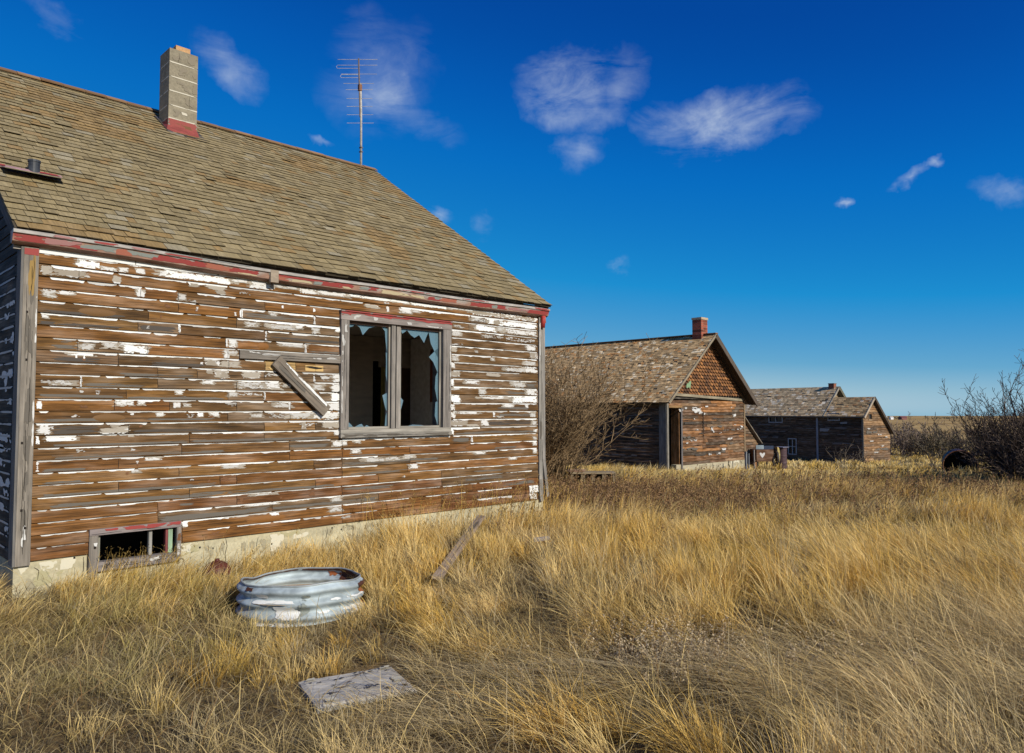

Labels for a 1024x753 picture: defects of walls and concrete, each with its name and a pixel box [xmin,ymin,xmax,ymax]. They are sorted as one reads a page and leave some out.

peeling [14,234,549,477]
peeling [0,433,11,511]
peeling [241,492,281,515]
peeling [327,496,350,519]
spalling [270,532,308,552]